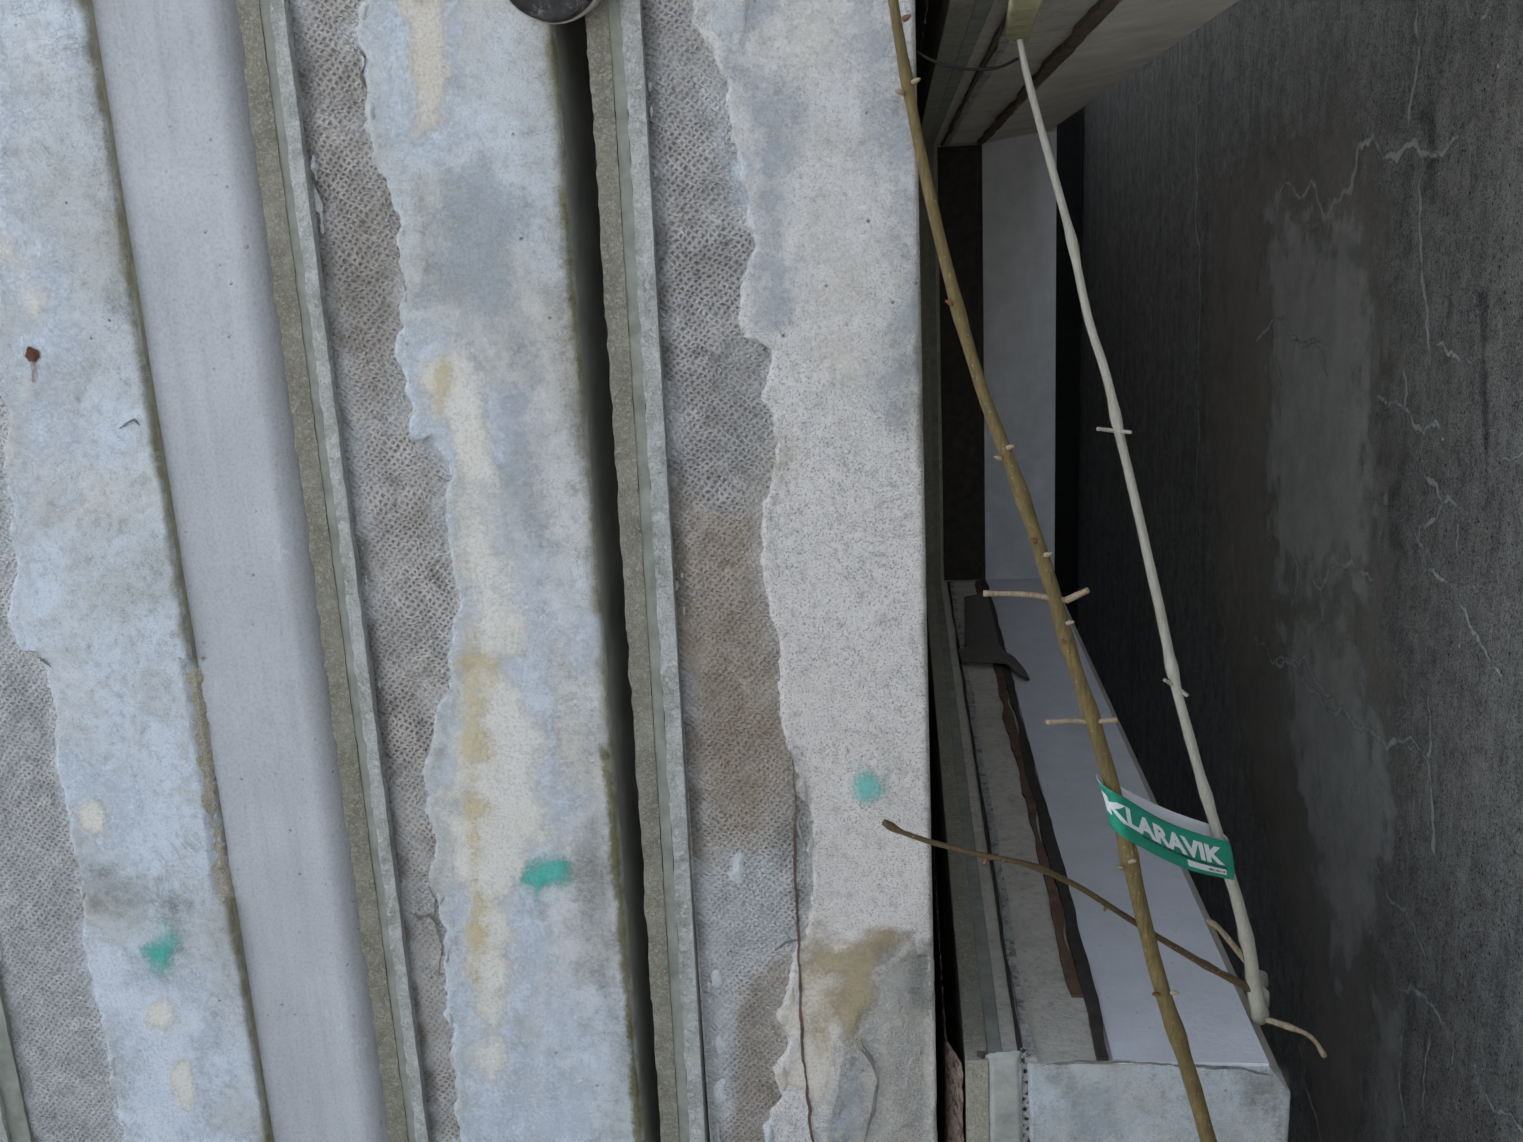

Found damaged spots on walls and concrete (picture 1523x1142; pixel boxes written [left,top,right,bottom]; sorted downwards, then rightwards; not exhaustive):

corrosion [25,346,39,382]
peeling [0,370,125,1142]
peeling [288,0,461,1142]
leakage [410,325,592,1142]
peeling [642,0,814,1142]
crack [775,752,814,1142]
crack [860,1039,879,1142]
spalling [949,581,1037,1142]
crack [1263,0,1503,677]
crack [1253,550,1523,1140]